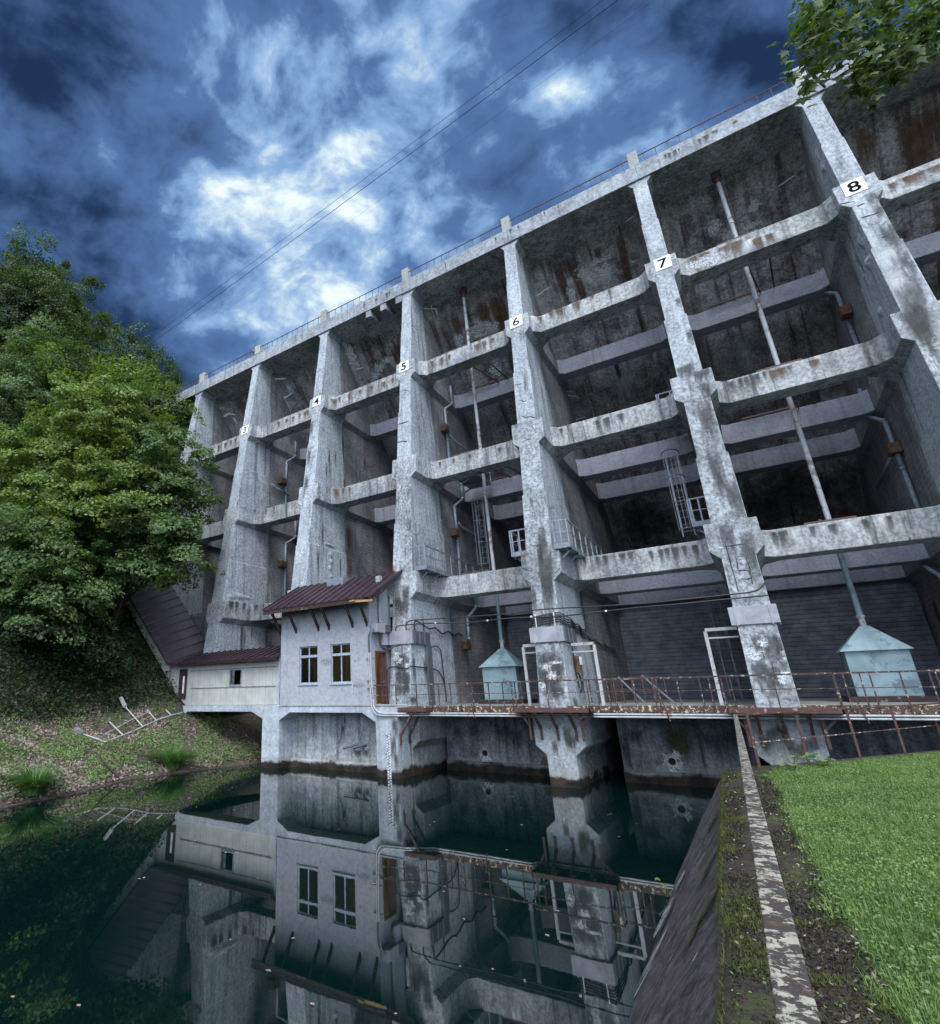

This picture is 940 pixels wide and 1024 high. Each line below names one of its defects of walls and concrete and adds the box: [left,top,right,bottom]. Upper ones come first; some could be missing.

leakage [567,252,614,309]
corrosion [689,233,774,263]
leakage [868,227,930,338]
corrosion [429,298,508,366]